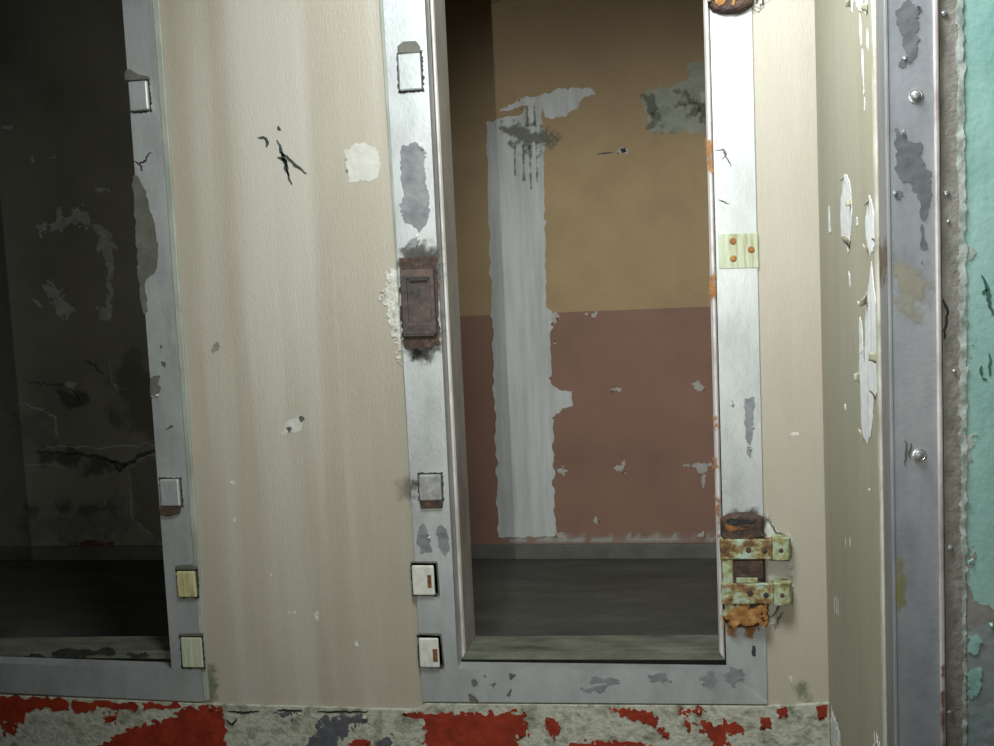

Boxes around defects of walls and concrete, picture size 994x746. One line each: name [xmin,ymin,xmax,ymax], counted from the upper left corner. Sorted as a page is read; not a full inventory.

peeling [640,60,706,135]
peeling [399,142,430,248]
peeling [893,128,933,263]
peeling [486,87,613,542]
peeling [828,174,877,445]
crack [13,379,156,535]
corrosion [721,615,759,638]
peeling [0,695,228,746]
peeling [306,713,395,746]
peeling [401,675,530,746]
peeling [569,707,670,746]
peeling [677,705,748,746]